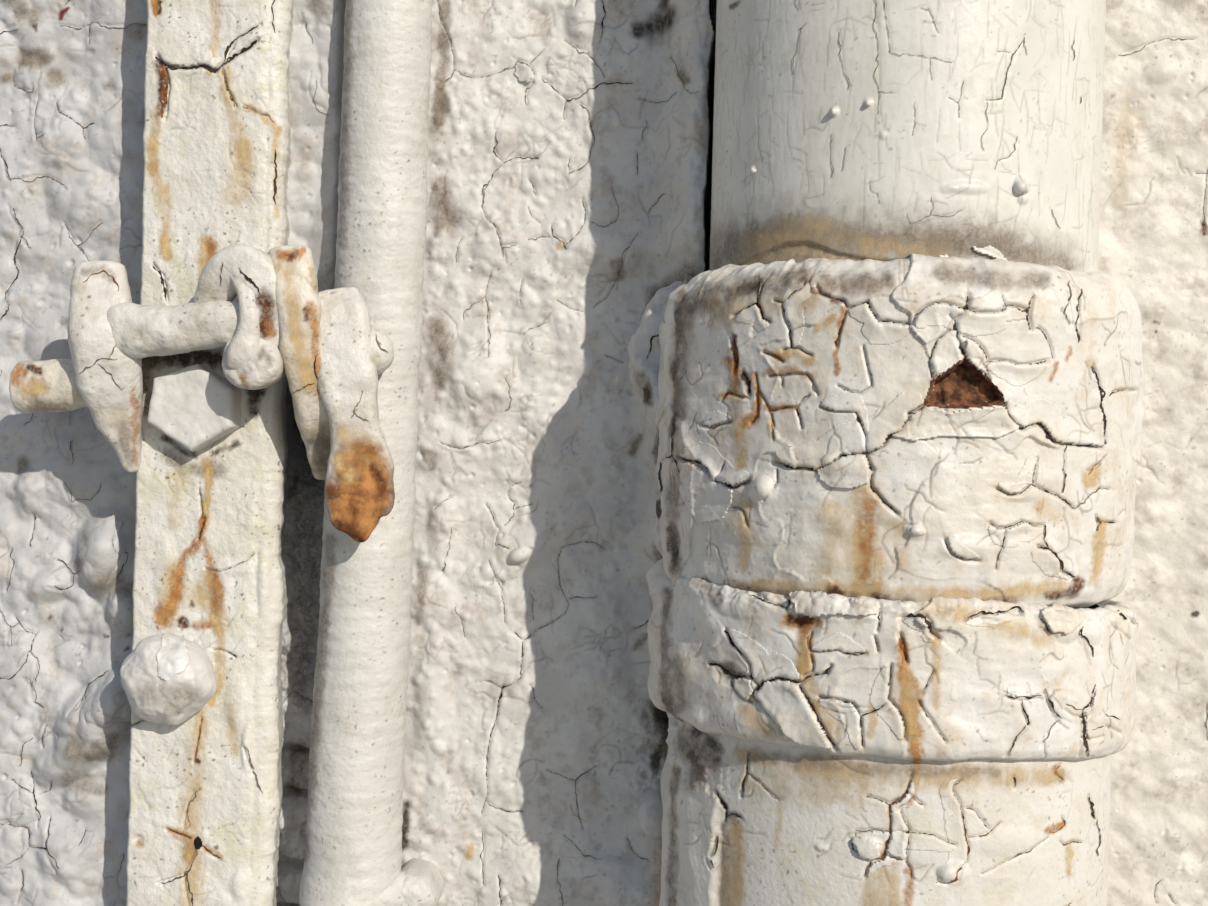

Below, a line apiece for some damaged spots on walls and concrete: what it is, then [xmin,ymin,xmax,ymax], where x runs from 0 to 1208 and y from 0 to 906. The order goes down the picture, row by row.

rust [156,60,167,116]
crack [438,1,699,410]
rust [312,428,395,542]
rust [722,335,813,468]
crack [658,275,1129,580]
spalling [892,330,1020,441]
rust [156,460,225,763]
crack [0,514,86,900]
crack [709,612,945,750]
rust [897,639,921,776]
crack [1005,626,1119,786]
crack [851,773,1101,884]